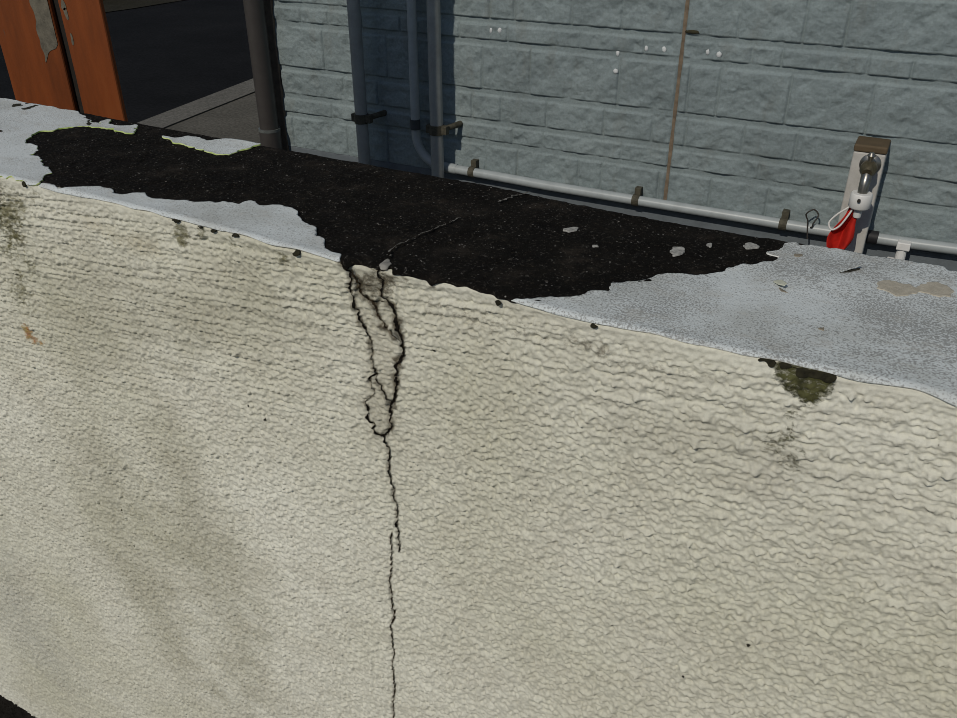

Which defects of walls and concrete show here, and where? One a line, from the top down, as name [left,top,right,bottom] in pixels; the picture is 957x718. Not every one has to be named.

peeling [26,112,805,306]
crack [340,217,461,718]